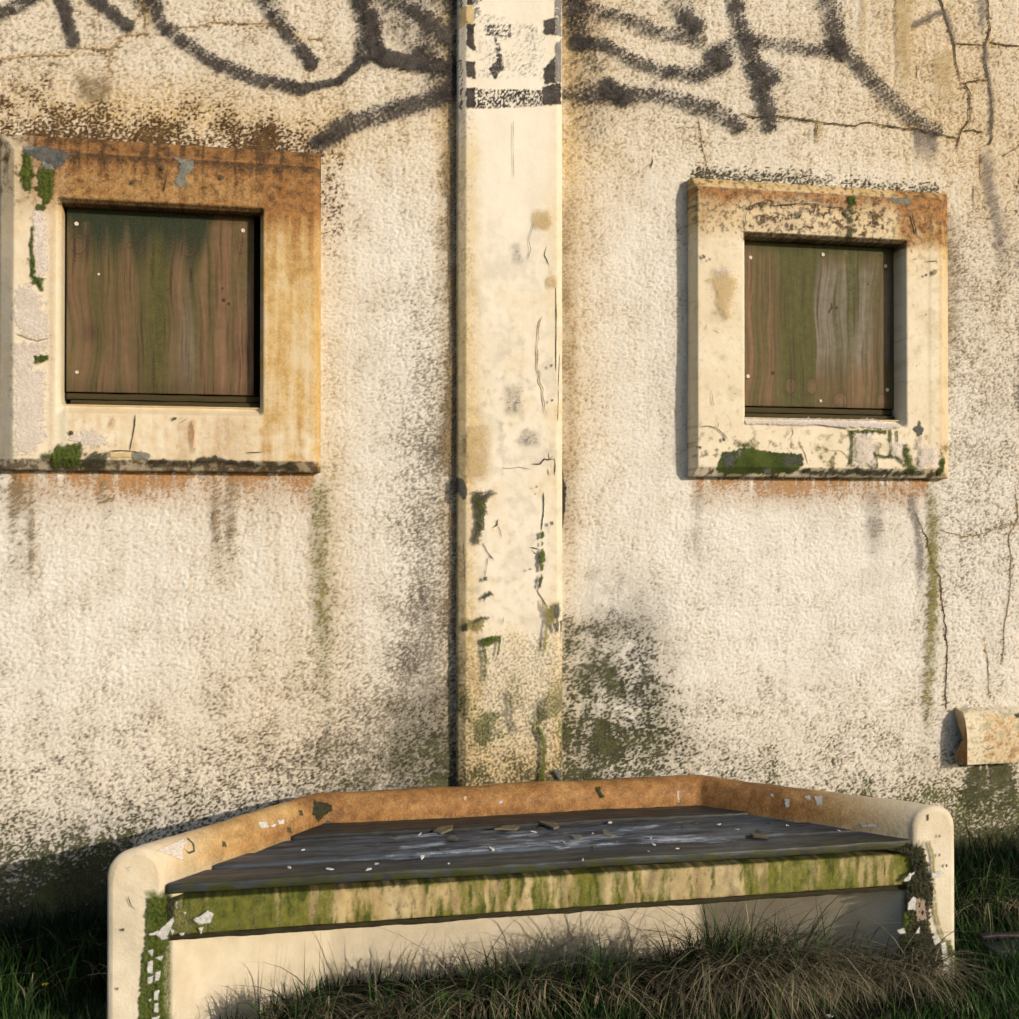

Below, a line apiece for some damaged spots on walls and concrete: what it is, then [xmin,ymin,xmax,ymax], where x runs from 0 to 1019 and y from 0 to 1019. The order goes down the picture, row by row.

leakage [78,75,111,102]
crack [742,0,1019,207]
spalling [23,146,73,170]
peeling [10,208,52,456]
peeling [69,430,150,460]
peeling [745,417,901,468]
peeling [892,442,903,458]
peeling [913,421,940,466]
spalling [550,469,567,527]
leakage [908,499,925,577]
crack [913,488,1019,708]
spalling [896,843,950,966]